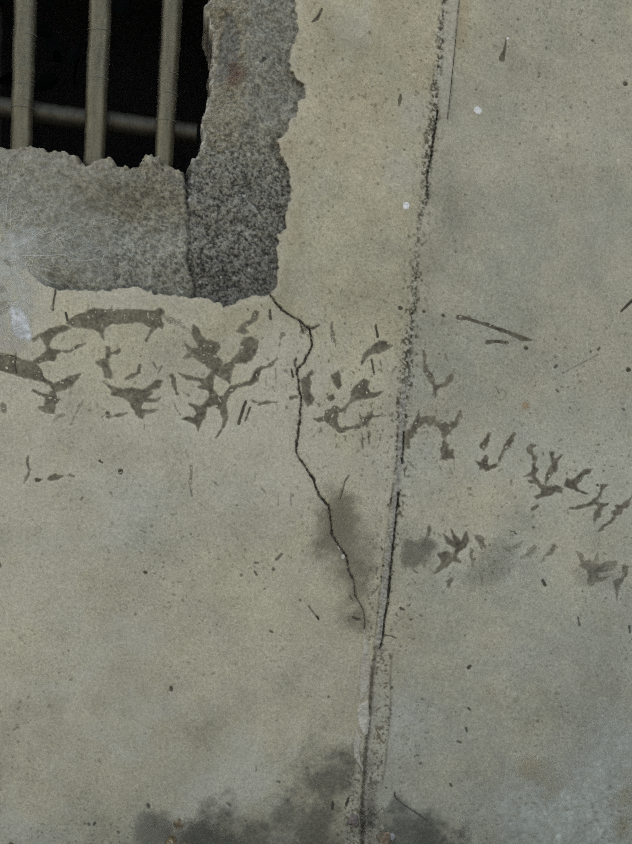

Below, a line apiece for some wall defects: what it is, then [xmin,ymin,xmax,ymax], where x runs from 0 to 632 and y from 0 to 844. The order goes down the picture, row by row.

spalling [0,0,306,308]
crack [269,295,400,648]
leakage [404,539,434,566]
leakage [137,811,267,844]
leakage [370,802,461,844]